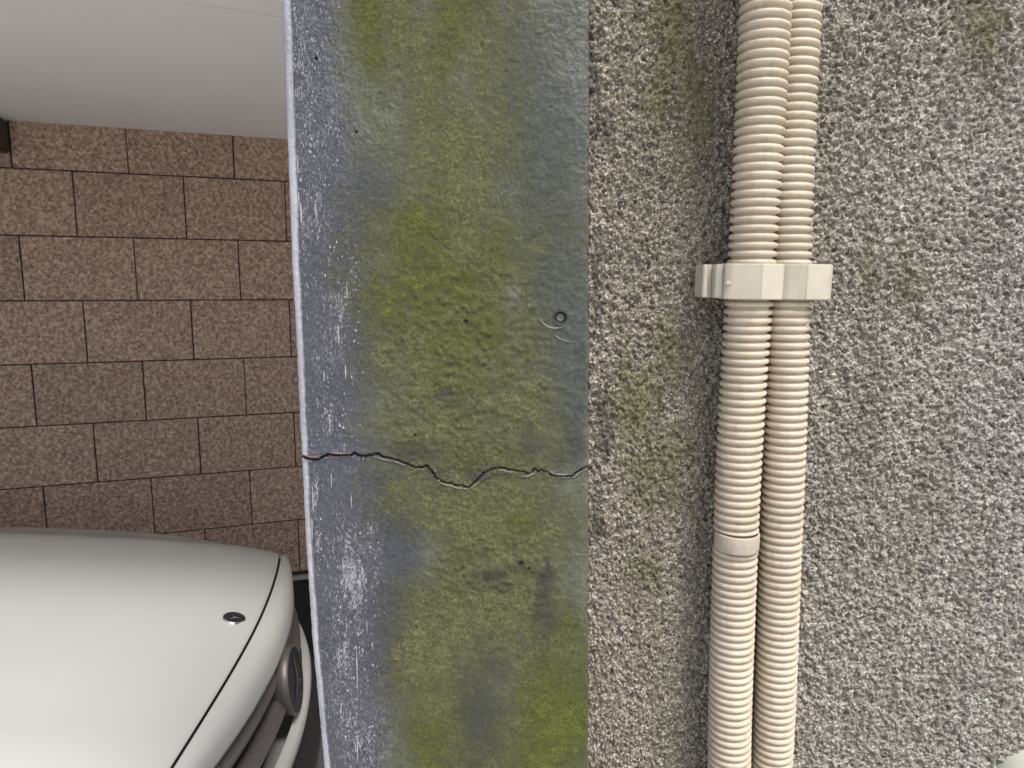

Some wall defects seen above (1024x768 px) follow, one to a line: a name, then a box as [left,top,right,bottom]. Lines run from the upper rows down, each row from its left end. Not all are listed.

crack [302,452,588,489]